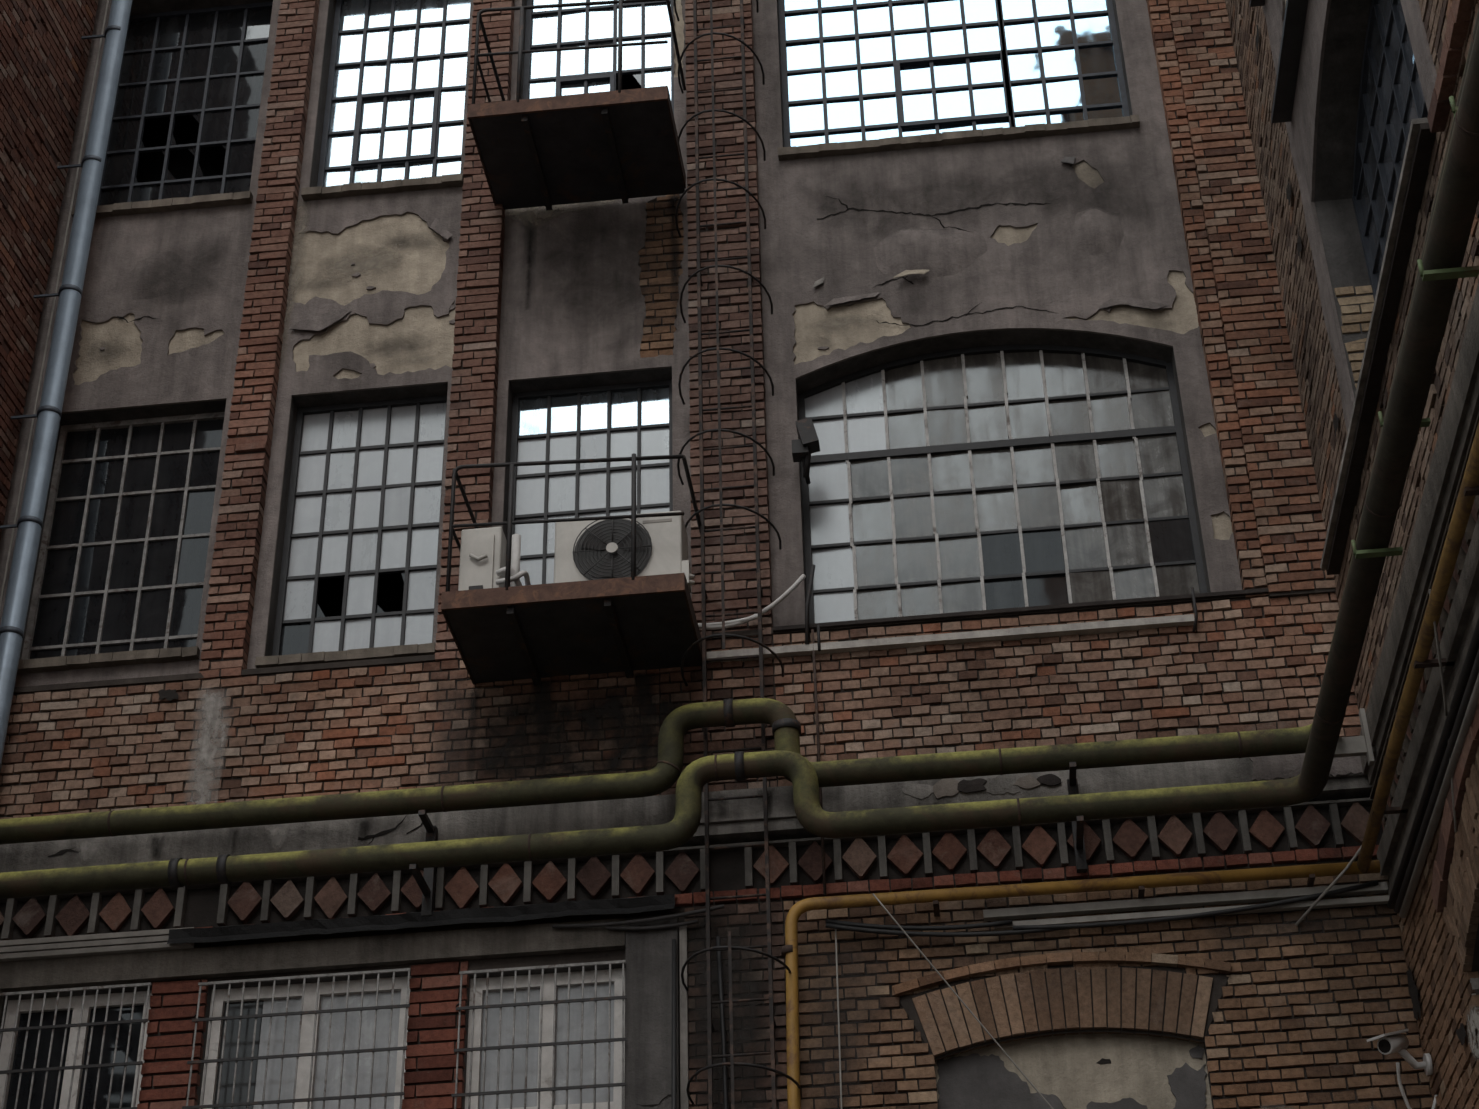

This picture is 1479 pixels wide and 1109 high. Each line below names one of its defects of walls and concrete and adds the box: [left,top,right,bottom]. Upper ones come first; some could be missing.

crack [817,196,1050,232]
flaking render [73,314,143,385]
flaking render [168,329,225,355]
flaking render [289,213,456,379]
flaking render [638,194,684,358]
flaking render [793,277,911,365]
flaking render [894,269,930,278]
spalling [1455,1009,1479,1058]
flaking render [936,1053,1064,1109]
flaking render [1086,1098,1148,1109]
flaking render [1167,1045,1207,1109]